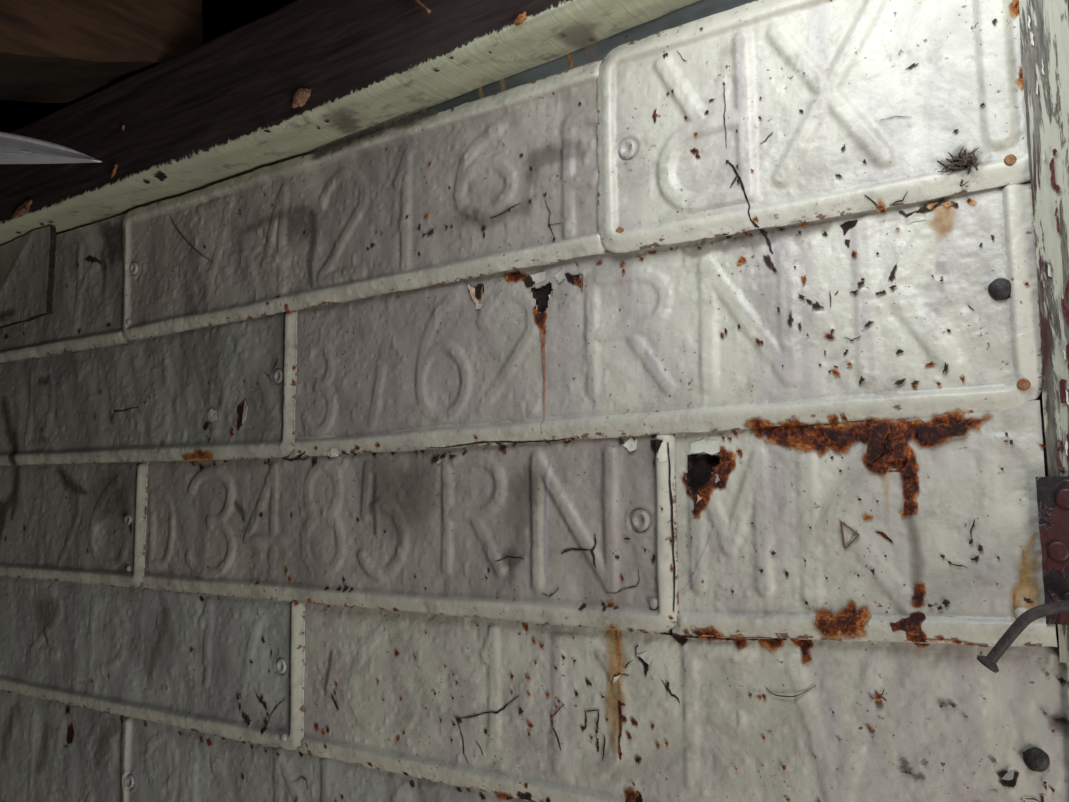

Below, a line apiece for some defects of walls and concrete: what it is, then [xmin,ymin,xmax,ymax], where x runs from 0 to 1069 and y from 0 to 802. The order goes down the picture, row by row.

peeling [1043,149,1061,233]
peeling [468,283,484,309]
peeling [1061,274,1069,323]
rust [533,305,547,406]
peeling [1059,343,1069,405]
rust [682,409,990,518]
peeling [1039,433,1069,471]
peeling [940,519,983,568]
rust [662,600,871,665]
rust [890,582,990,648]
rust [580,625,646,760]